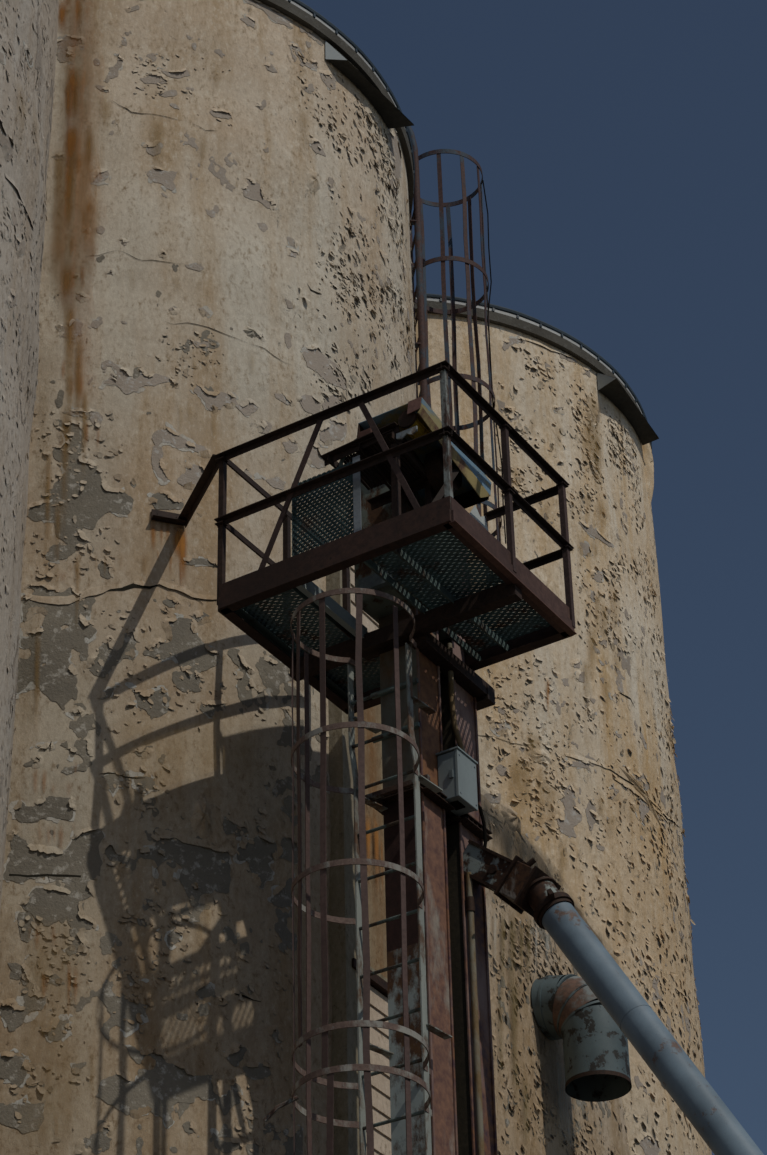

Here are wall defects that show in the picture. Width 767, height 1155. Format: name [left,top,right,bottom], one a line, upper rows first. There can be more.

rust [57,130,91,213]
peeling [240,0,417,468]
crack [25,579,217,605]
peeling [0,0,329,1155]
peeling [482,335,705,1077]
peeling [488,897,713,1155]